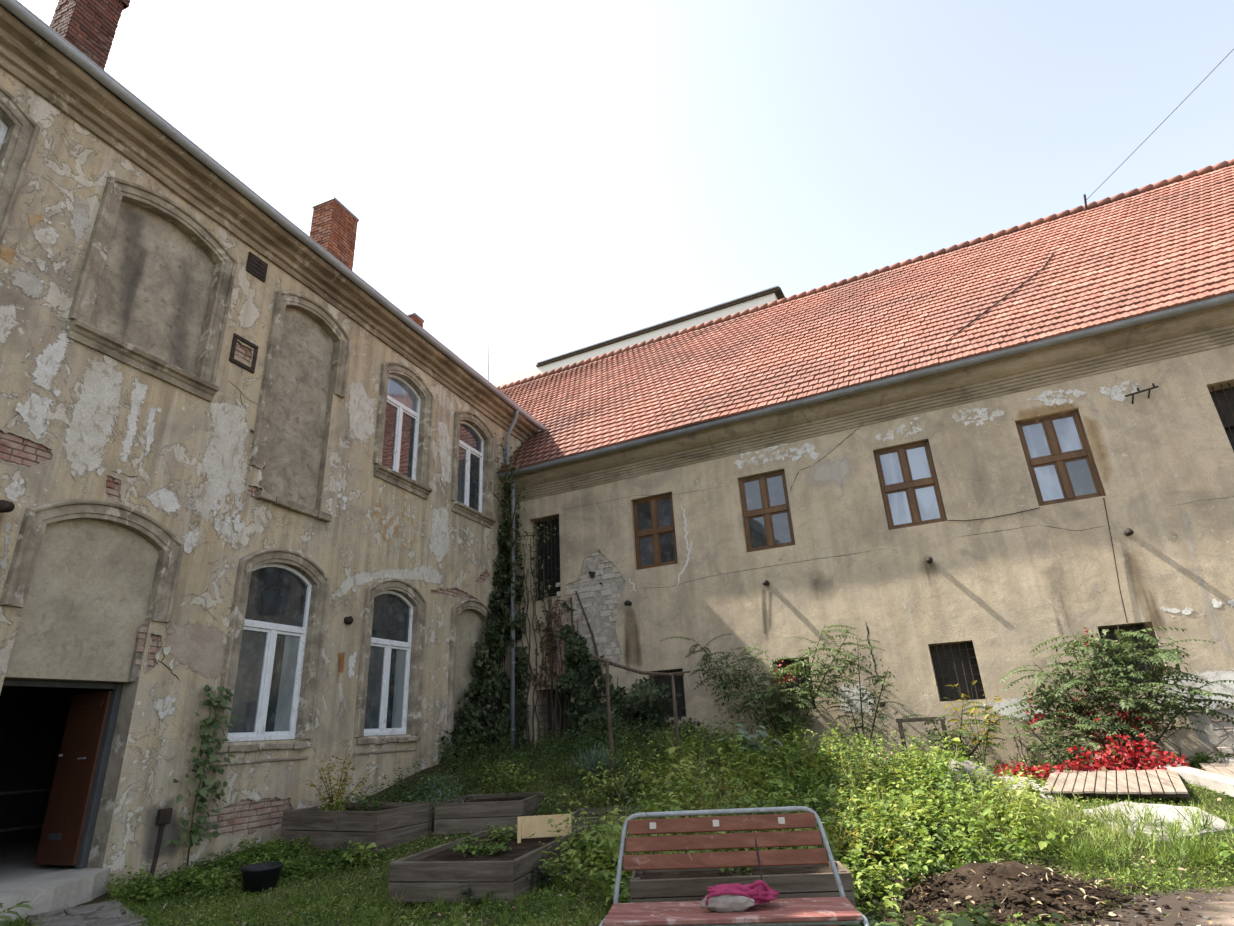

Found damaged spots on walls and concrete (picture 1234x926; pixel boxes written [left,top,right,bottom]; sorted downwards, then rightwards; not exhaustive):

peeling [0,196,91,345]
peeling [0,325,161,503]
peeling [145,402,272,554]
spalling [235,339,253,366]
peeling [348,382,375,443]
peeling [733,442,819,469]
peeling [875,417,922,441]
peeling [952,407,1005,426]
peeling [1027,380,1141,406]
crack [564,486,885,592]
spalling [543,548,626,681]
spalling [1154,668,1234,757]